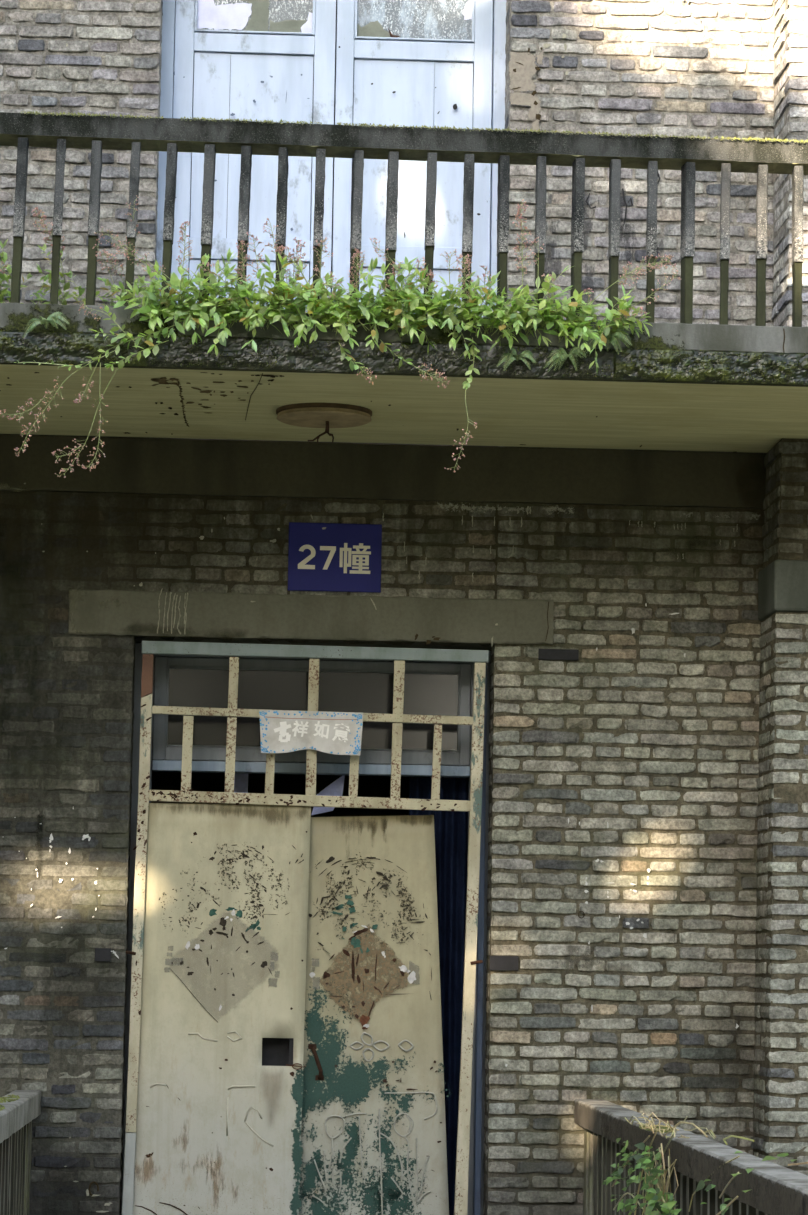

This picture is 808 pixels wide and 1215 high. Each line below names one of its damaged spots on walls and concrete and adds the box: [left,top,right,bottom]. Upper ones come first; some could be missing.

peeling [159,843,432,998]
peeling [289,987,452,1215]